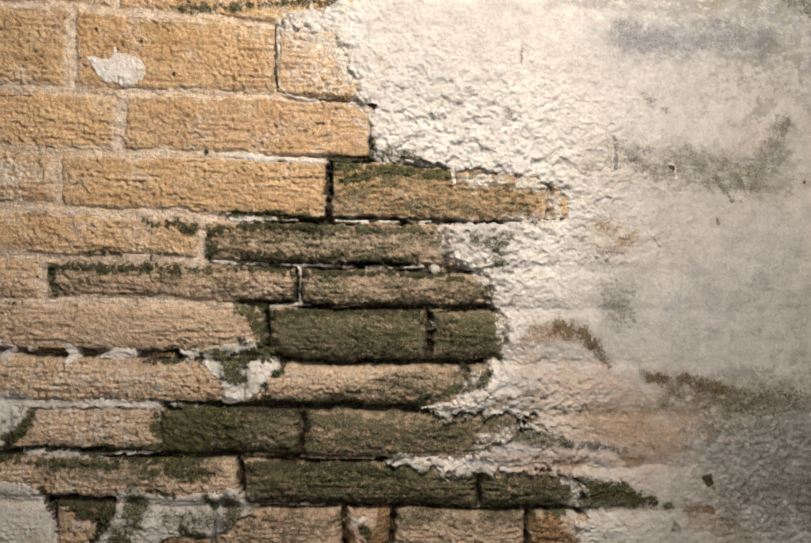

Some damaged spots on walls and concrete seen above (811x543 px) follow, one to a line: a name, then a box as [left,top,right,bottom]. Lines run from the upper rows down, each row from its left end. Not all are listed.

peeling [371,149,437,168]
damp [626,149,745,203]
peeling [503,213,544,226]
peeling [281,263,441,279]
peeling [443,223,493,275]
peeling [426,292,510,413]
damp [529,320,611,368]
damp [643,370,804,442]
peeling [390,419,525,482]
damp [573,479,657,508]